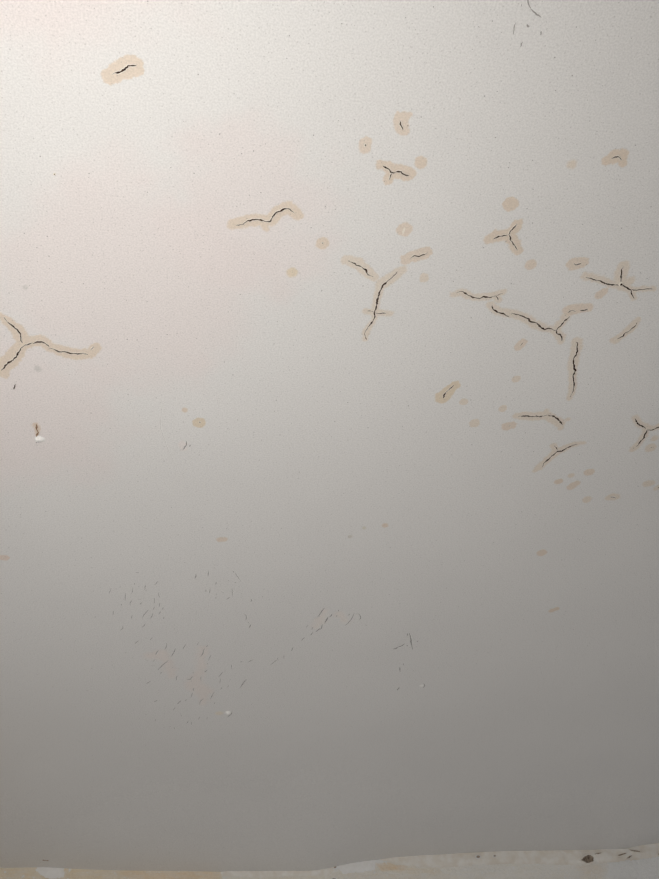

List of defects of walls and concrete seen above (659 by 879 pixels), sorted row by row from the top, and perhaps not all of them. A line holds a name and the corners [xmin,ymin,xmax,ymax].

hole [578,852,603,865]
leakage [0,861,613,879]